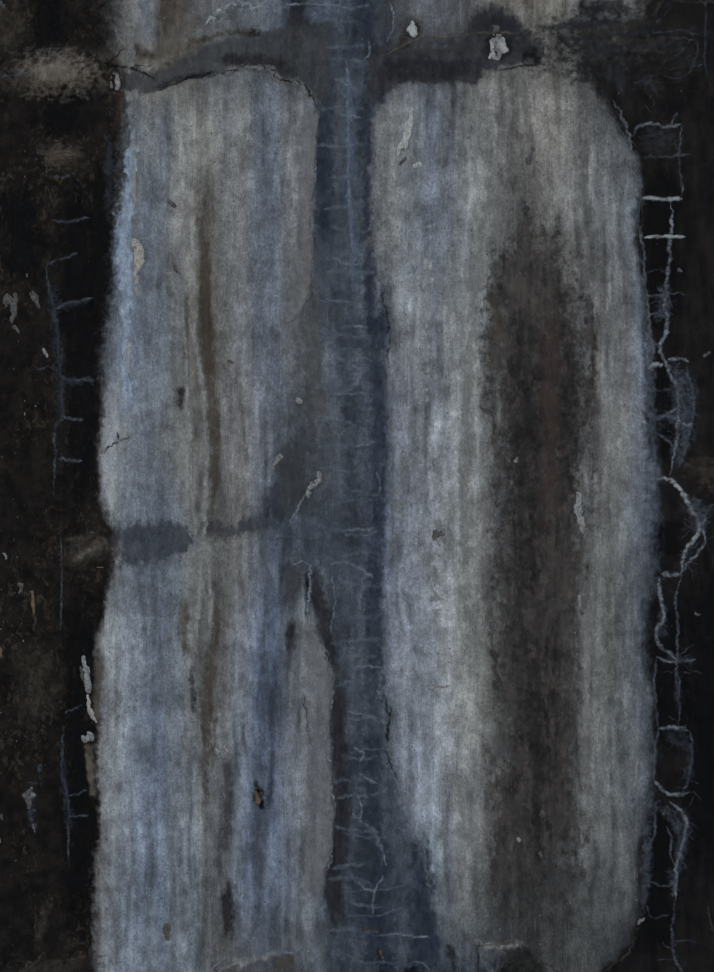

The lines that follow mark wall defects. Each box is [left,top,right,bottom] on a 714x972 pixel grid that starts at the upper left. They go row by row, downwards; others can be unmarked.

peeling [400,21,420,49]
peeling [484,25,509,61]
crack [335,7,515,265]
peeling [131,238,144,295]
damp [0,0,543,972]
crack [278,482,374,651]
damp [458,181,598,912]
damp [544,0,714,972]
crack [597,0,714,972]
peeling [80,656,104,796]
crack [352,748,416,913]
crack [209,951,304,972]